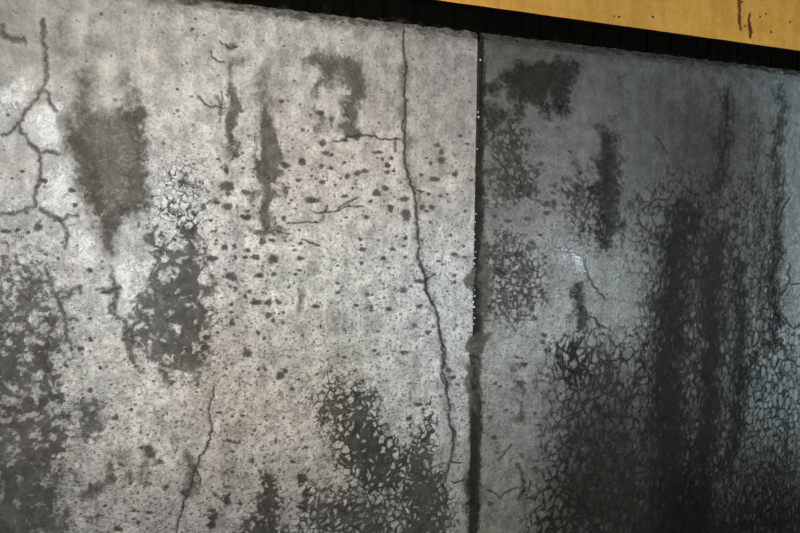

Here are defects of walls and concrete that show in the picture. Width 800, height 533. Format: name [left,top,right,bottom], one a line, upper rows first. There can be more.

water stain [0,76,34,116]
crack [1,18,79,249]
water stain [25,78,306,386]
crack [333,27,465,504]
water stain [214,41,800,533]
water stain [0,223,123,533]
crack [557,342,604,394]
water stain [127,445,164,485]
water stain [182,453,199,499]
crack [176,386,215,533]
water stain [207,509,219,529]